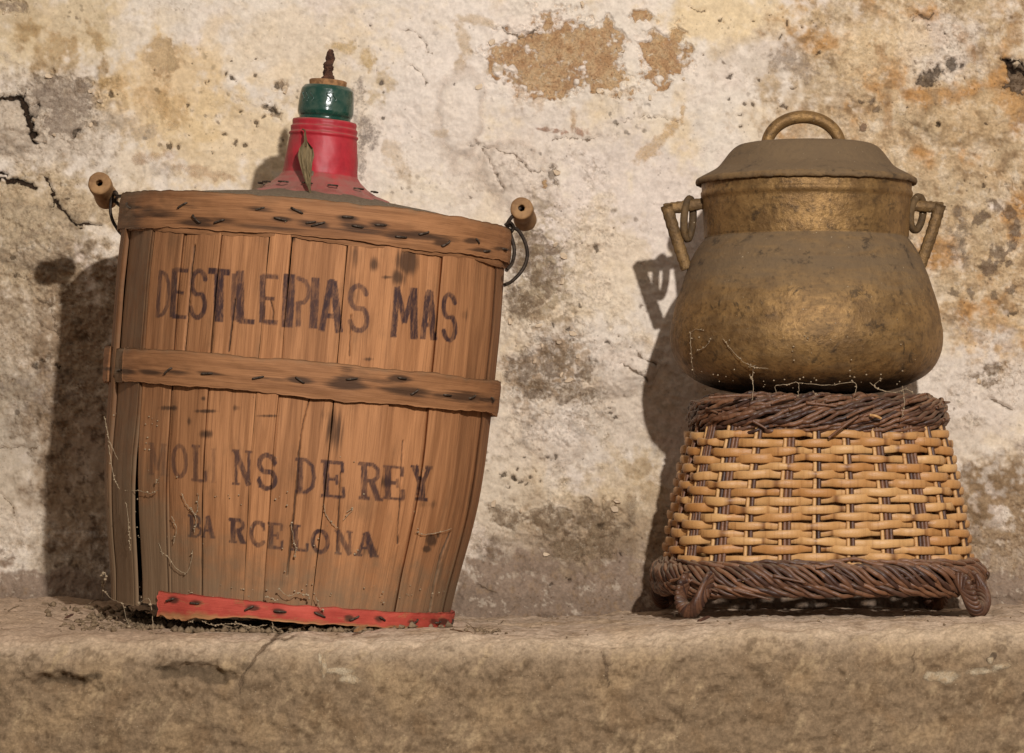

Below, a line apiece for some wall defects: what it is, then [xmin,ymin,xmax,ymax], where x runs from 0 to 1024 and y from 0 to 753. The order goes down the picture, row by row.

flaking render [475,1,704,101]
flaking render [1002,62,1024,95]
crack [0,89,40,144]
crack [0,171,102,229]
crack [239,626,294,693]